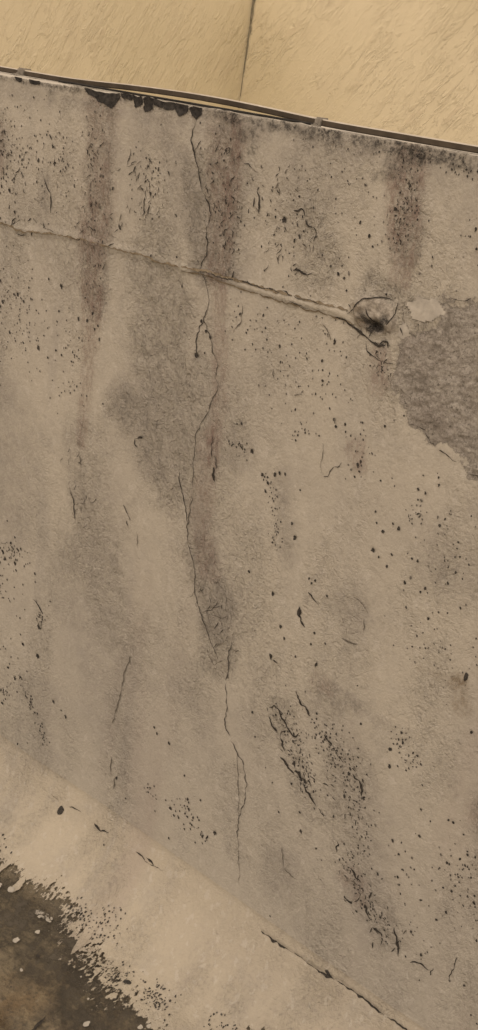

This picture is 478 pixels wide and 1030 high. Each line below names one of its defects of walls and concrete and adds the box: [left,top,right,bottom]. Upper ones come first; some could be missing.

peeling [363,294,478,480]
crack [0,126,392,881]
damp [0,880,152,1030]
crack [261,931,407,1030]